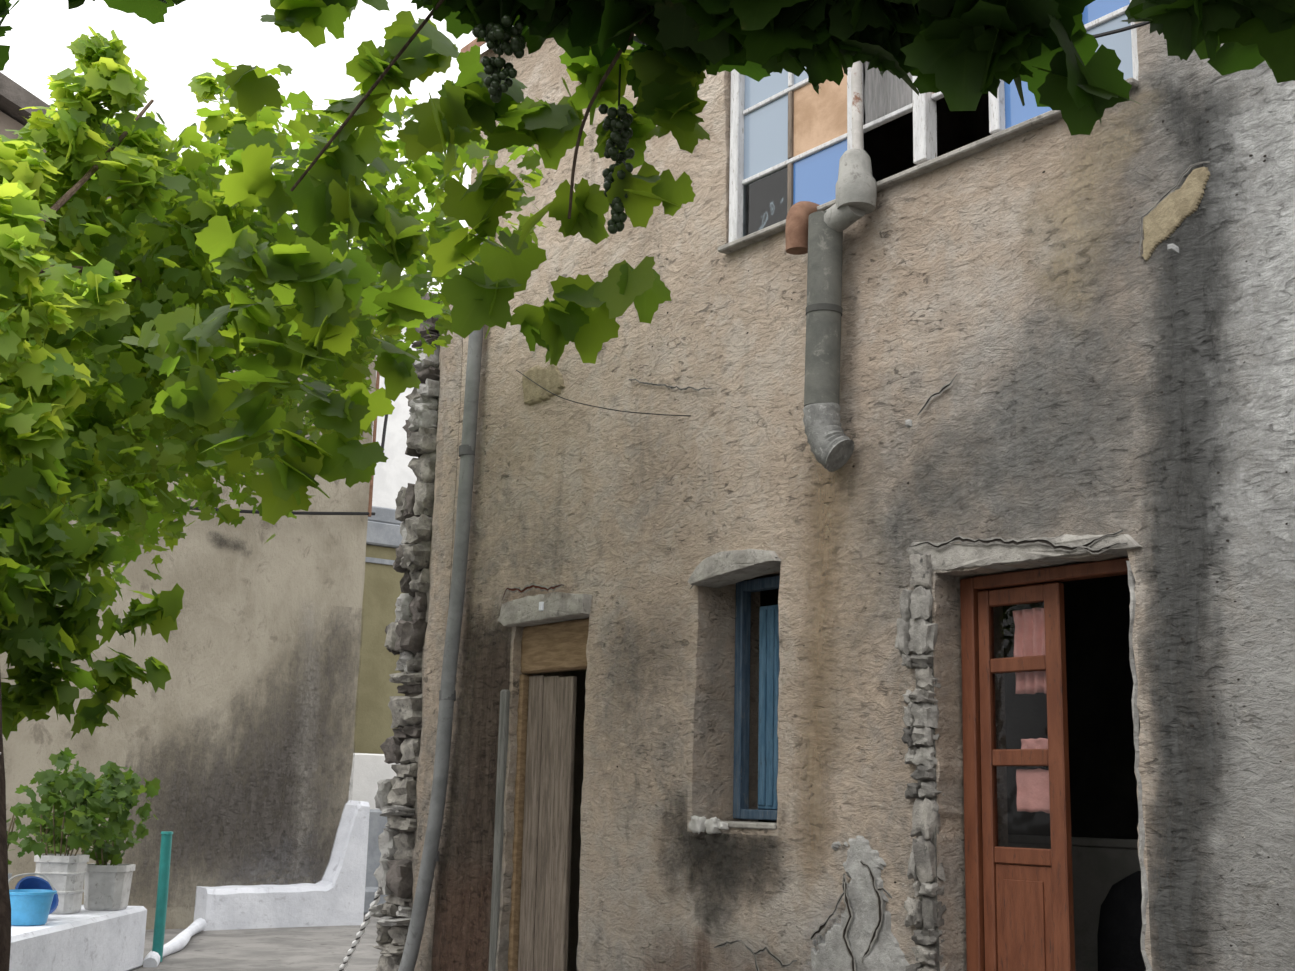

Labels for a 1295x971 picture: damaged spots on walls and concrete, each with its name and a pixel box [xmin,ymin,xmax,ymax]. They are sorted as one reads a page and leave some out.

peeling [1139,162,1210,261]
crack [909,530,1127,554]
leakage [665,799,778,930]